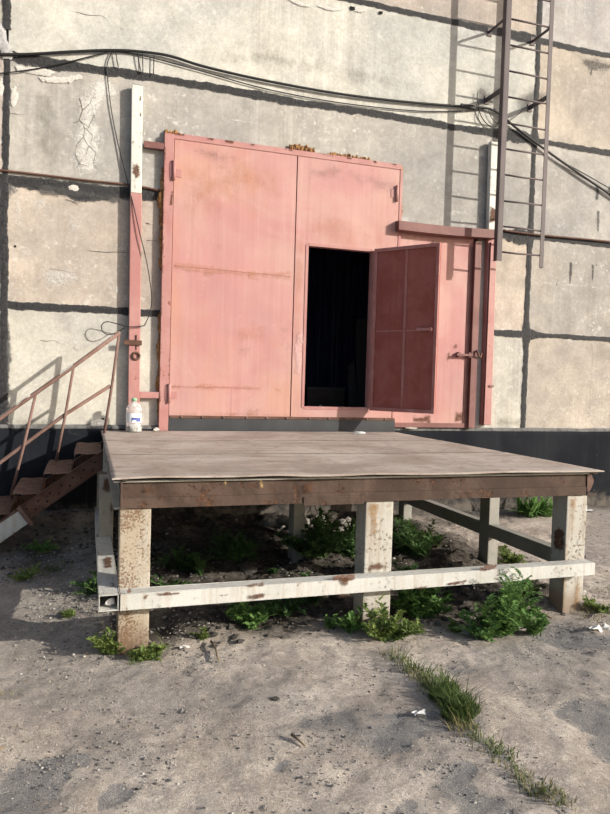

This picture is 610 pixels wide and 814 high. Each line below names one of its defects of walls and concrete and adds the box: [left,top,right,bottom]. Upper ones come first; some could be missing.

spalling [15,65,83,83]
spalling [0,78,19,107]
crack [74,96,97,174]
rust [554,529,564,550]
rust [333,574,355,585]